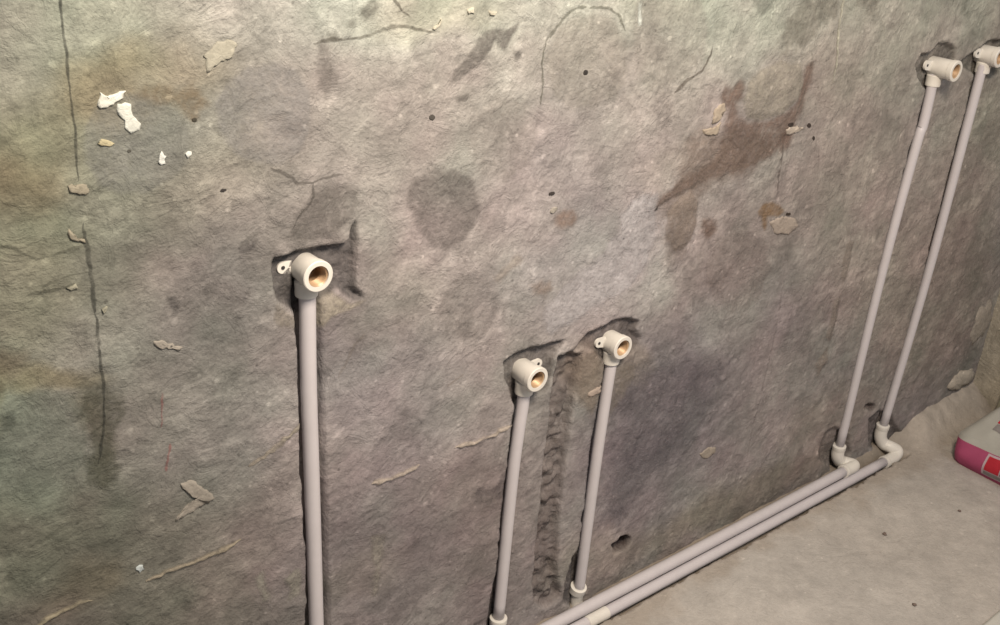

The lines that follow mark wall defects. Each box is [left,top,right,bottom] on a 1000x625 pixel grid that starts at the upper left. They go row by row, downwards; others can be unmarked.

peeling [97,91,141,134]
water stain [455,26,516,80]
crack [84,236,105,463]
water stain [539,44,1000,625]
water stain [489,358,548,625]